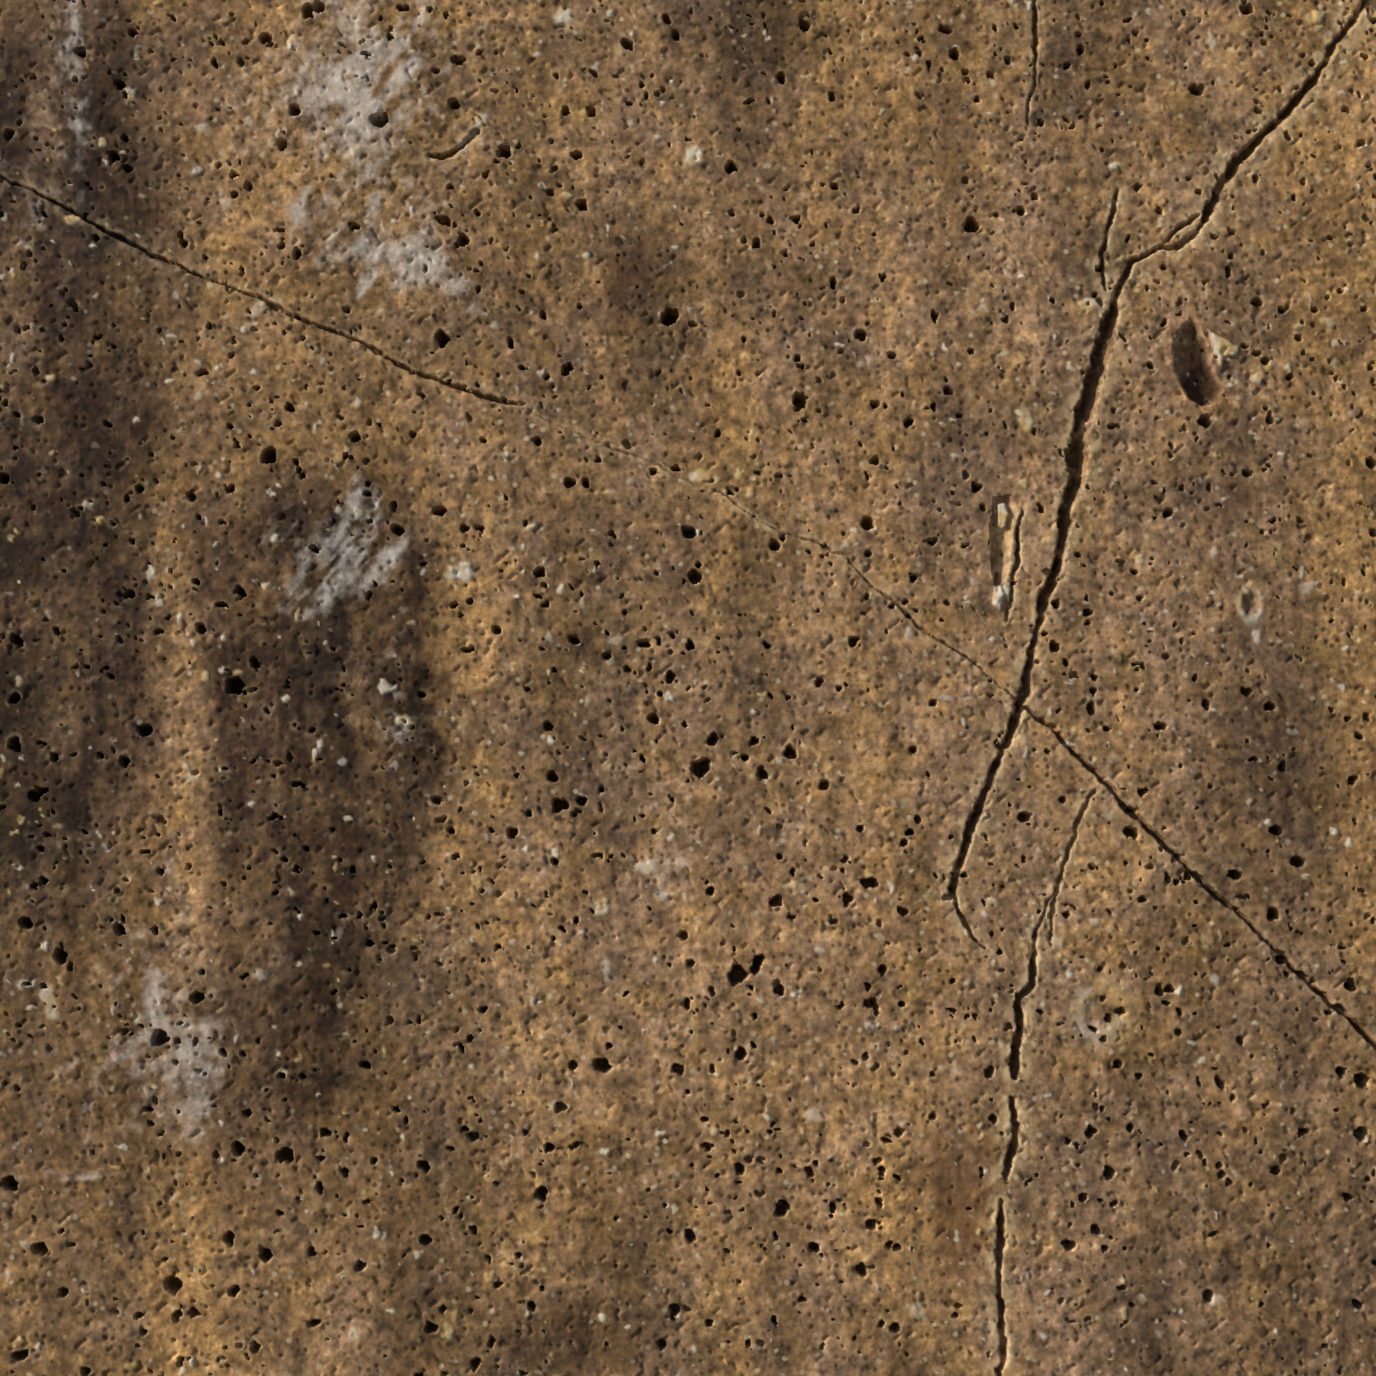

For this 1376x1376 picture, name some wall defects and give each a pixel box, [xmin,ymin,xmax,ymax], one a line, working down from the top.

water stain [0,0,724,1376]
crack [0,0,1376,1083]
crack [991,1194,1013,1376]
crack [999,1089,1026,1184]